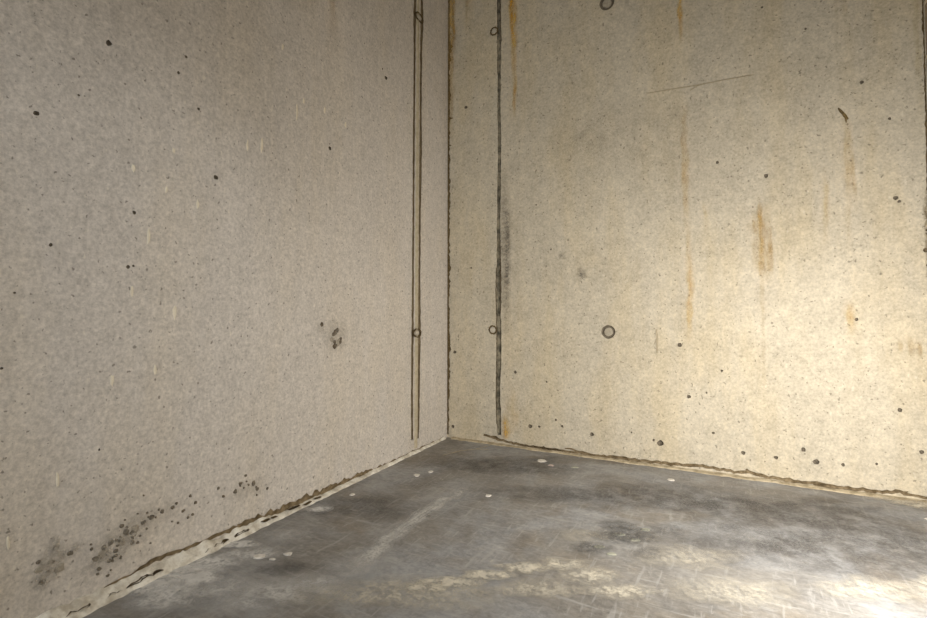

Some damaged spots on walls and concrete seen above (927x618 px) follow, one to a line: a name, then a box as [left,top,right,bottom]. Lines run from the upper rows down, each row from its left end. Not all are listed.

damp [742,503,891,534]
damp [132,540,326,607]
damp [345,558,647,602]